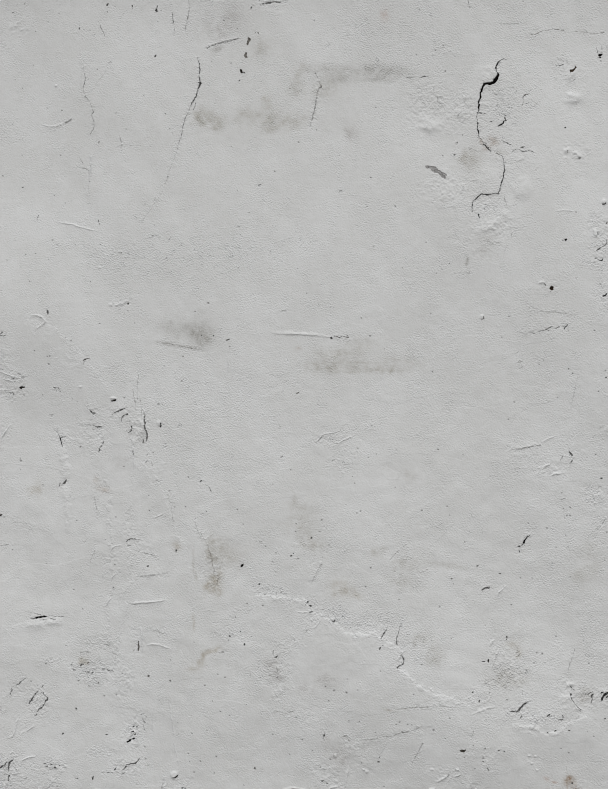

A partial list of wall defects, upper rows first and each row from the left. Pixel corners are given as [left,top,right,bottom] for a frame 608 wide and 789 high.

crack [471,58,539,219]